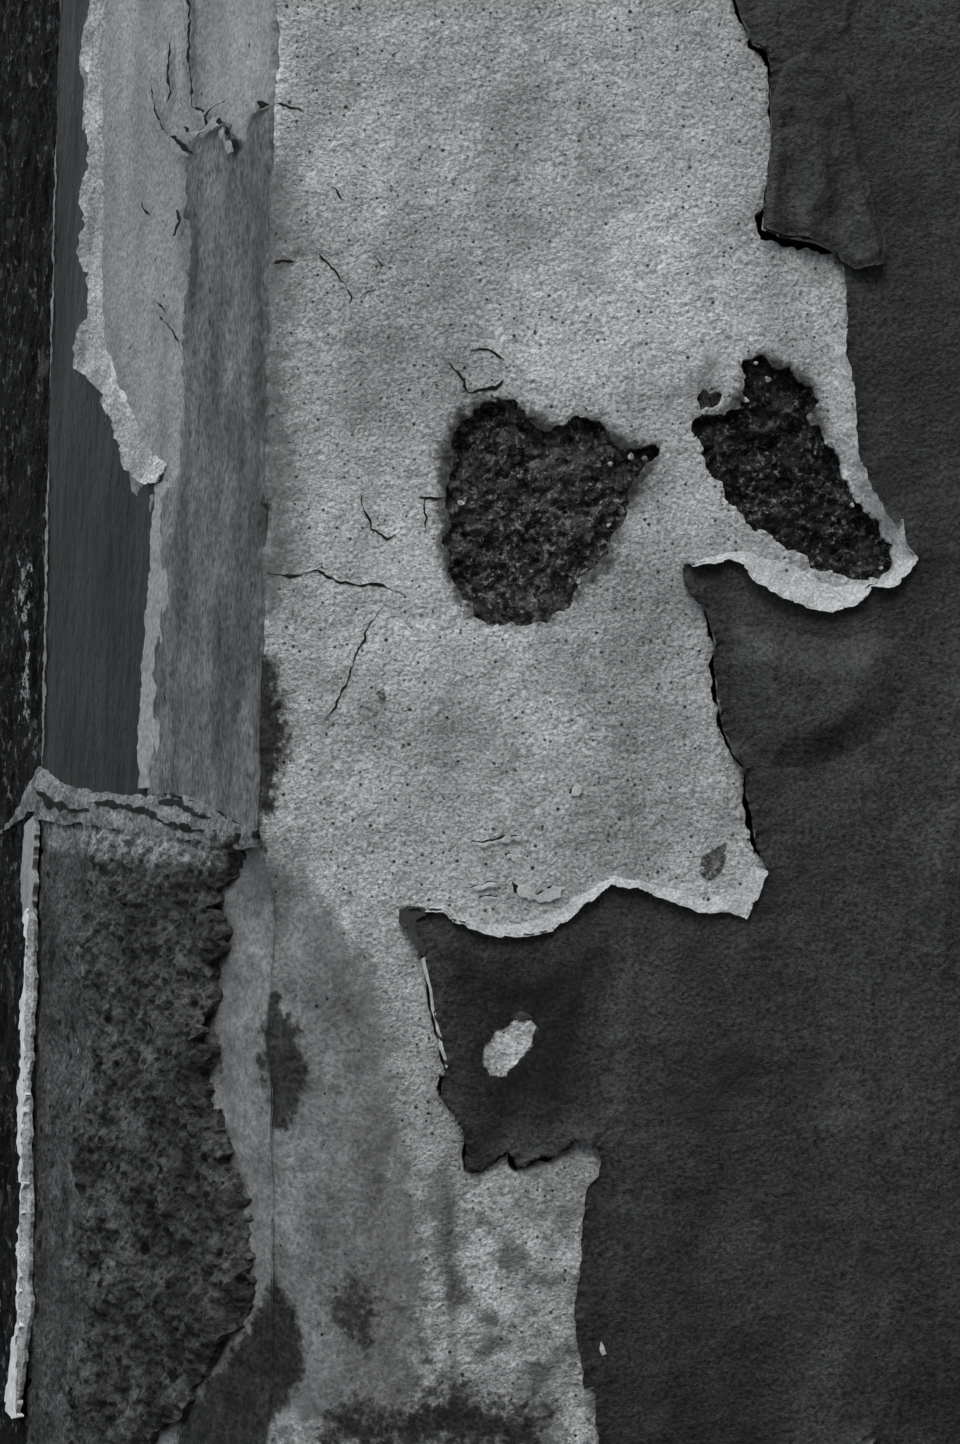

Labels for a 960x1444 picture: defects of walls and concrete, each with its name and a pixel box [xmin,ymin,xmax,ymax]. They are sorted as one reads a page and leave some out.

crack [141,202,181,236]
crack [156,302,179,343]
peeling [72,0,280,830]
crack [147,0,303,157]
peeling [258,0,918,1444]
spalling [4,816,257,1444]